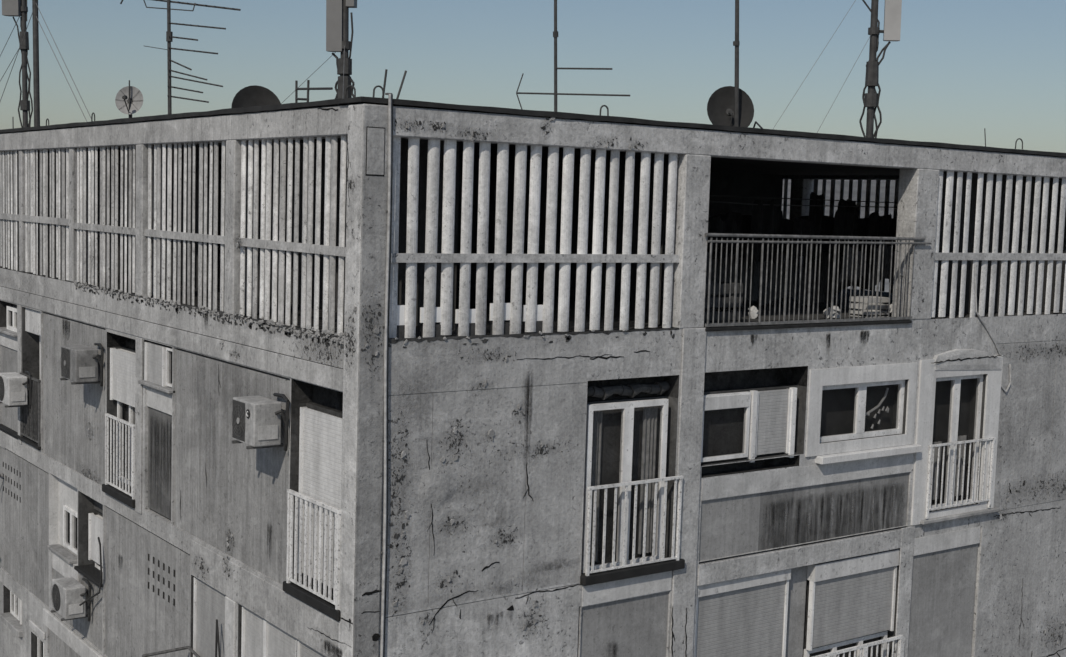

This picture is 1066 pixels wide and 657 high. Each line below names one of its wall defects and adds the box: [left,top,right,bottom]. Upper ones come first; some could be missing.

crack [517,350,650,360]
leakage [766,488,894,550]
crack [429,562,500,632]
crack [515,584,581,604]